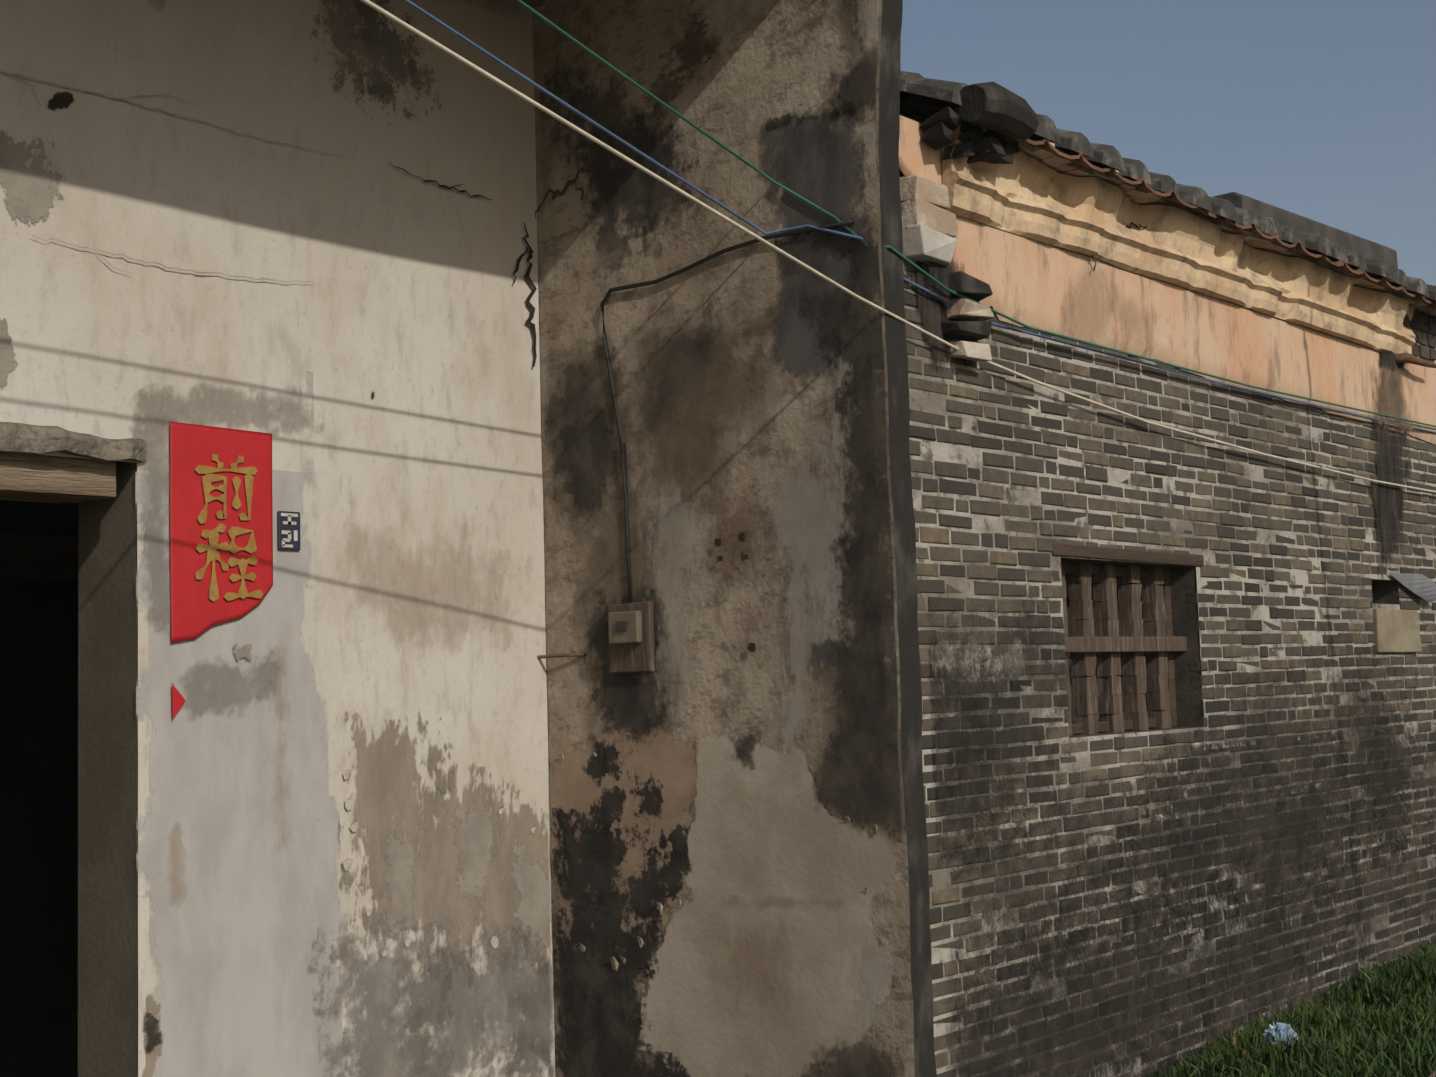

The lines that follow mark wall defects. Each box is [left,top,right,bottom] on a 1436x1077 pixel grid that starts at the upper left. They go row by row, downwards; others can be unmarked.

peeling [0,130,65,227]
spalling [48,91,74,110]
crack [0,71,350,158]
damp [309,0,442,119]
crack [390,163,491,200]
damp [539,0,718,273]
crack [32,235,314,283]
crack [513,167,593,367]
peeling [0,318,18,387]
damp [767,227,903,843]
peeling [338,712,697,983]
damp [317,895,690,1077]